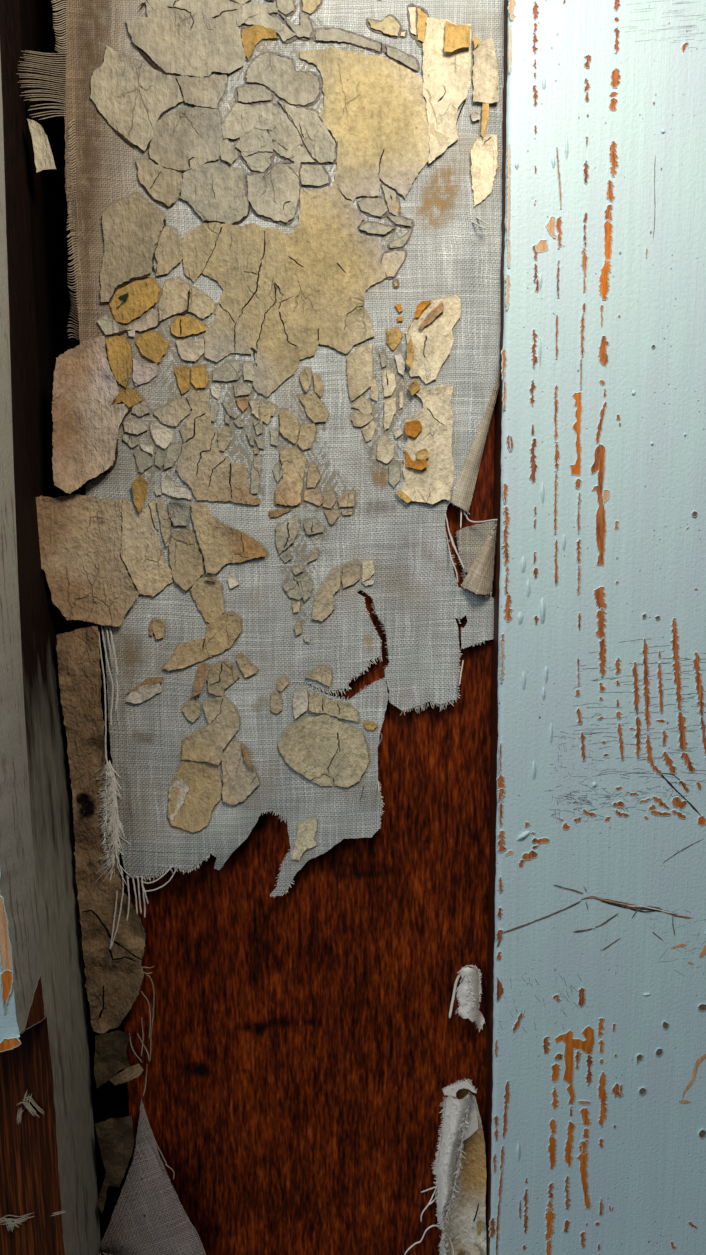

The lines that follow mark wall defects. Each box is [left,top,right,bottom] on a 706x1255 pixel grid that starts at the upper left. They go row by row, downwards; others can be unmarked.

crack [138,0,237,30]
crack [381,42,417,71]
crack [438,87,466,124]
peeling [531,1,540,107]
peeling [608,0,621,111]
crack [100,44,362,364]
crack [71,388,134,493]
crack [183,417,232,498]
peeling [36,0,516,833]
peeling [532,140,706,830]
peeling [496,743,550,868]
peeling [542,1017,623,1255]